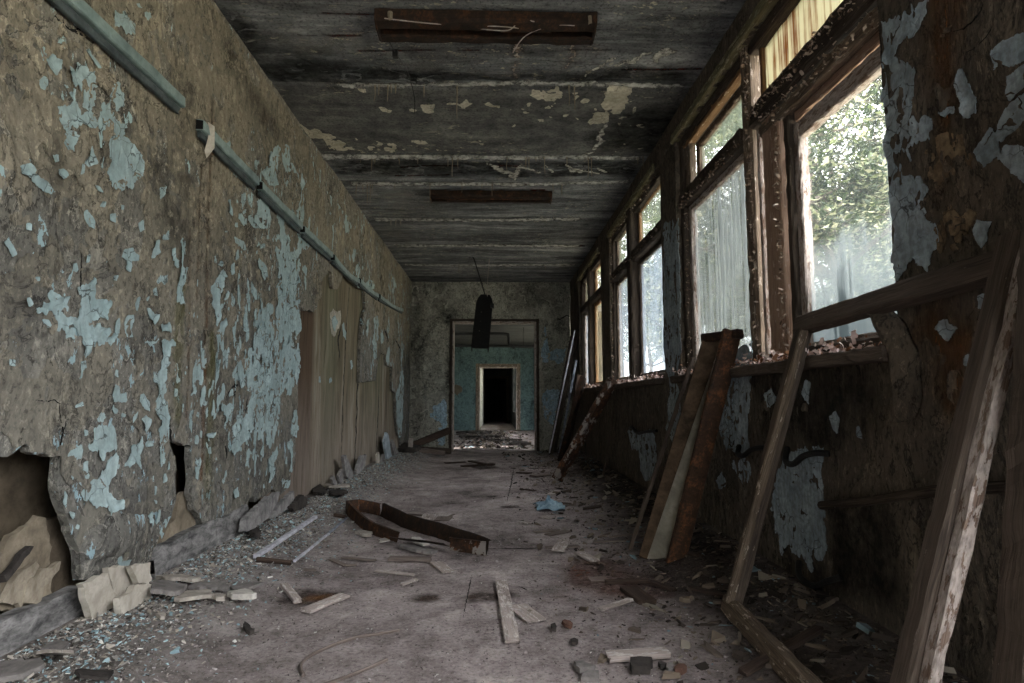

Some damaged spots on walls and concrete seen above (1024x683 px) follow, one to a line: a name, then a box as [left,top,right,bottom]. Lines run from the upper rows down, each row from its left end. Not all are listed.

peeling [0,0,571,566]
peeling [758,445,833,577]
peeling [580,0,1024,543]
peeling [944,530,1000,683]